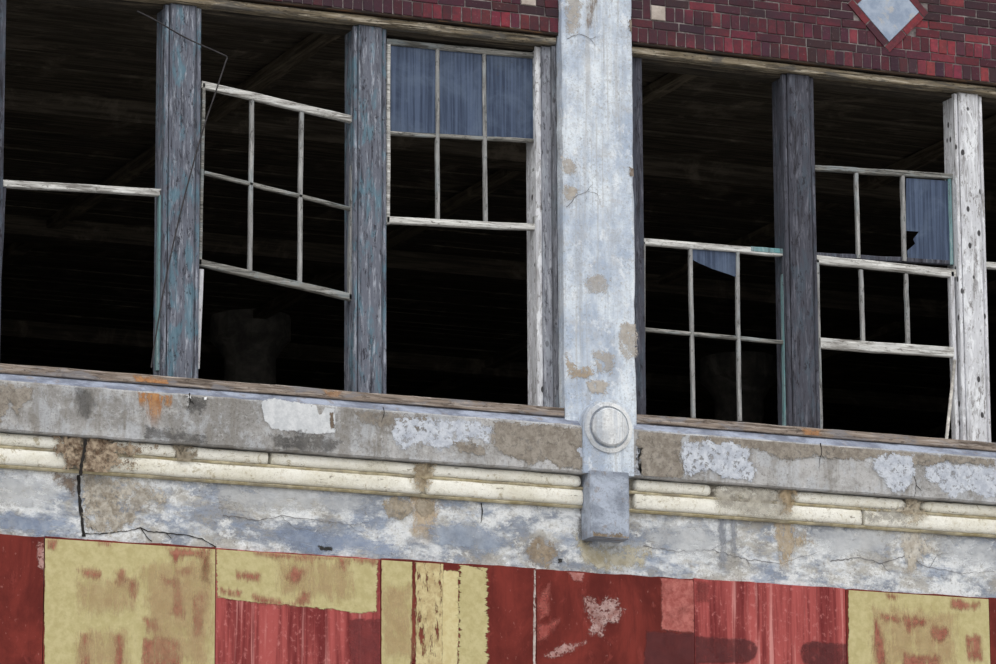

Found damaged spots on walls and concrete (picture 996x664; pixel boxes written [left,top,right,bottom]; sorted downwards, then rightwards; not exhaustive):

corrosion [134,375,172,415]
peeling [564,320,639,395]
spalling [52,436,167,536]
crack [77,439,216,548]
peeling [382,417,582,520]
peeling [629,431,996,525]